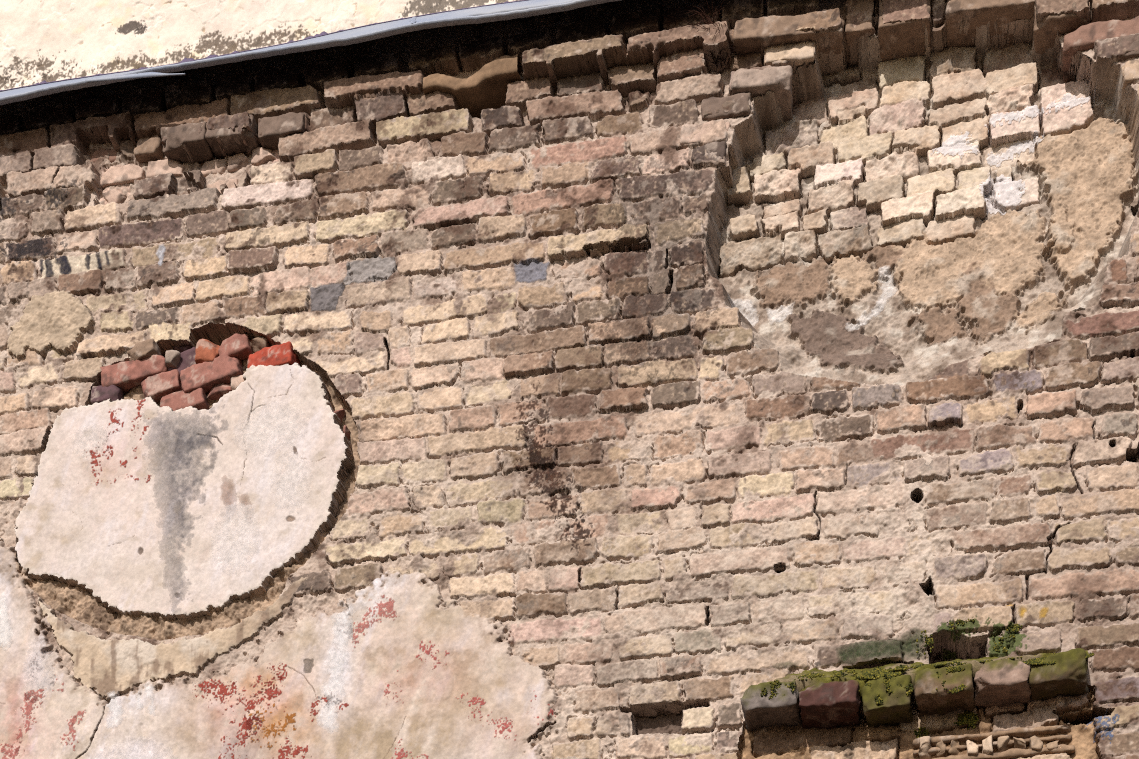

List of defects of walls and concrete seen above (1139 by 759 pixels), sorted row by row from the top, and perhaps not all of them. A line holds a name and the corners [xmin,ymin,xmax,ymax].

water stain [0,24,310,88]
spalling [80,123,280,205]
spalling [705,12,1139,385]
water stain [164,425,210,520]
spalling [928,651,985,664]
spalling [627,705,709,735]